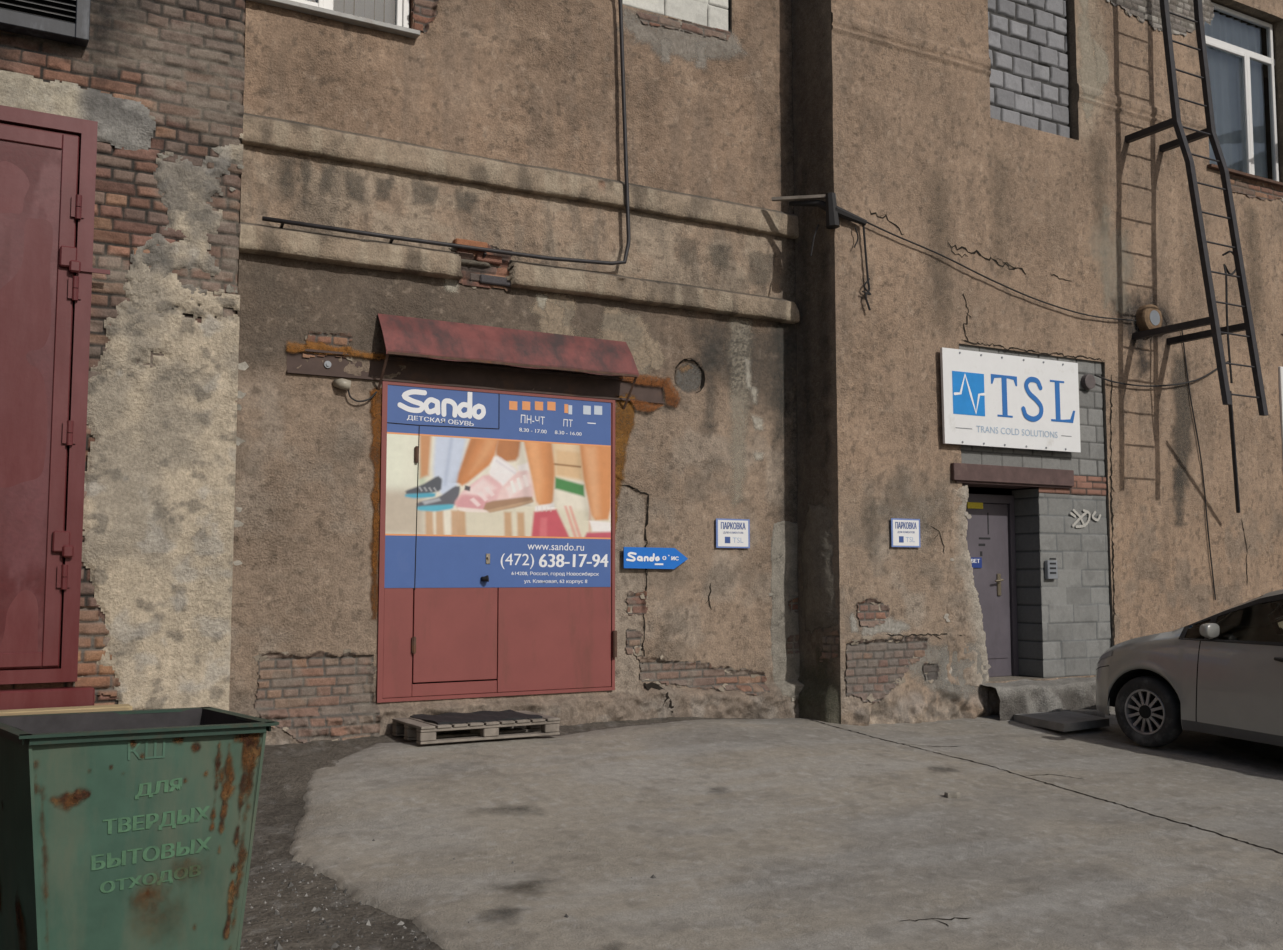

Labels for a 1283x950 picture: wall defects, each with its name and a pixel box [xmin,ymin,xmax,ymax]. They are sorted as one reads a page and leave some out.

peeling [1078,0,1109,118]
spalling [1107,0,1215,37]
crack [870,211,904,235]
peeling [0,70,249,711]
spalling [302,331,353,361]
corrosion [287,340,386,360]
leakage [1173,360,1190,526]
spalling [624,590,770,695]
spalling [819,485,991,703]
spalling [253,649,381,743]